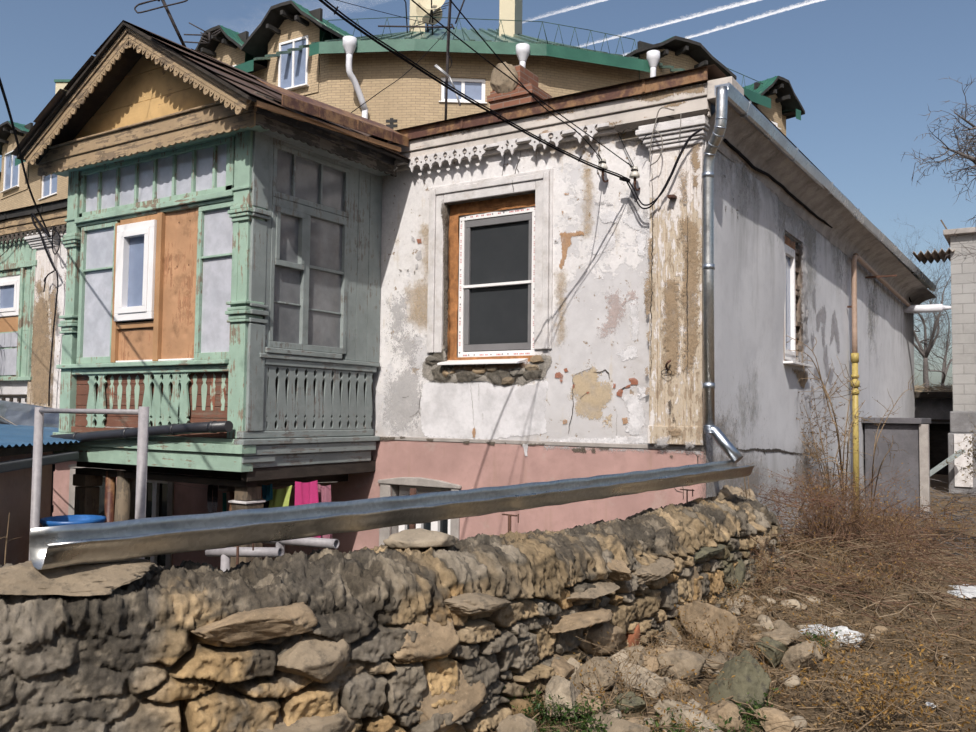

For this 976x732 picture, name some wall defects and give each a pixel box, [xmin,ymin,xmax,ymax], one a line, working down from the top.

peeling [678,168,688,204]
peeling [590,194,702,377]
flaking render [380,202,650,441]
peeling [426,427,476,444]
flaking render [521,443,644,453]
flaking render [655,400,702,458]
crack [736,447,804,455]